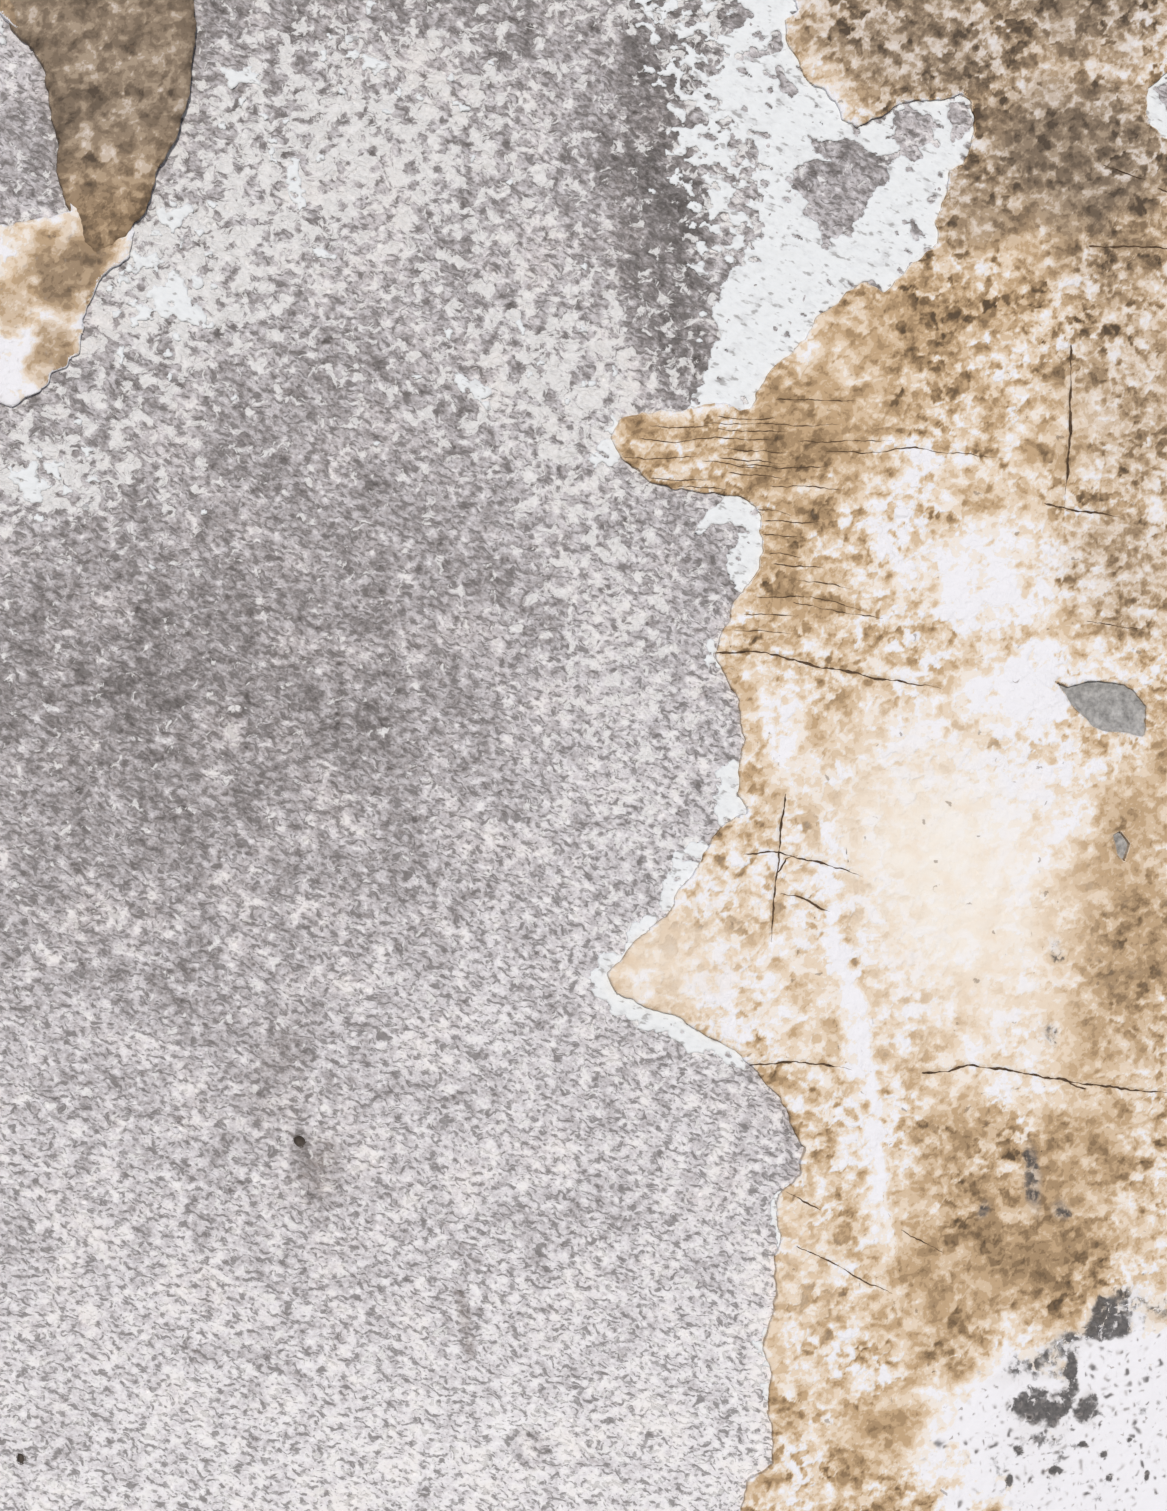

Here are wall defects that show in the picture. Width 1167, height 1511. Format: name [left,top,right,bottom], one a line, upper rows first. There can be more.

peeling [1146,73,1167,139]
peeling [635,0,974,411]
water stain [0,205,130,393]
crack [826,446,987,457]
crack [1045,345,1119,517]
peeling [0,0,804,1511]
crack [716,651,941,689]
water stain [570,0,1167,1490]
spalling [1058,681,1145,736]
crack [747,794,862,942]
crack [749,1061,848,1069]
crack [922,1064,1167,1093]